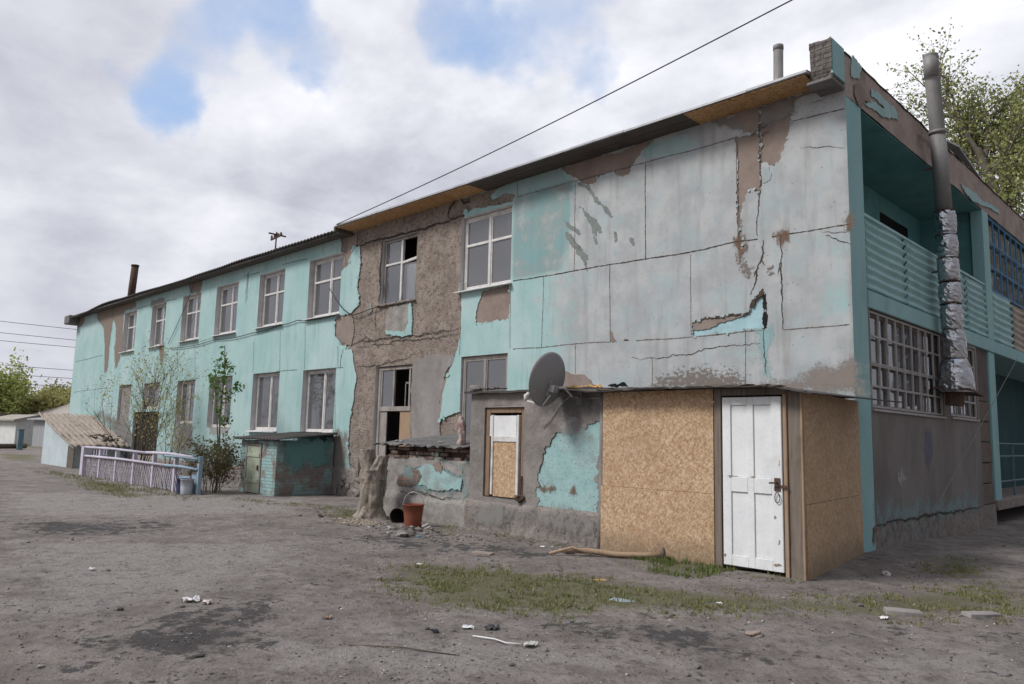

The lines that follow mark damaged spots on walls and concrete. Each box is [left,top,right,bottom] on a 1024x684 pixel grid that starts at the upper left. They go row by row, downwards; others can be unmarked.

peeling [562,140,653,184]
peeling [714,91,815,249]
crack [357,197,469,246]
crack [634,110,783,372]
spalling [333,187,516,468]
peeling [692,288,768,338]
spalling [397,470,421,486]
peeling [536,416,600,512]